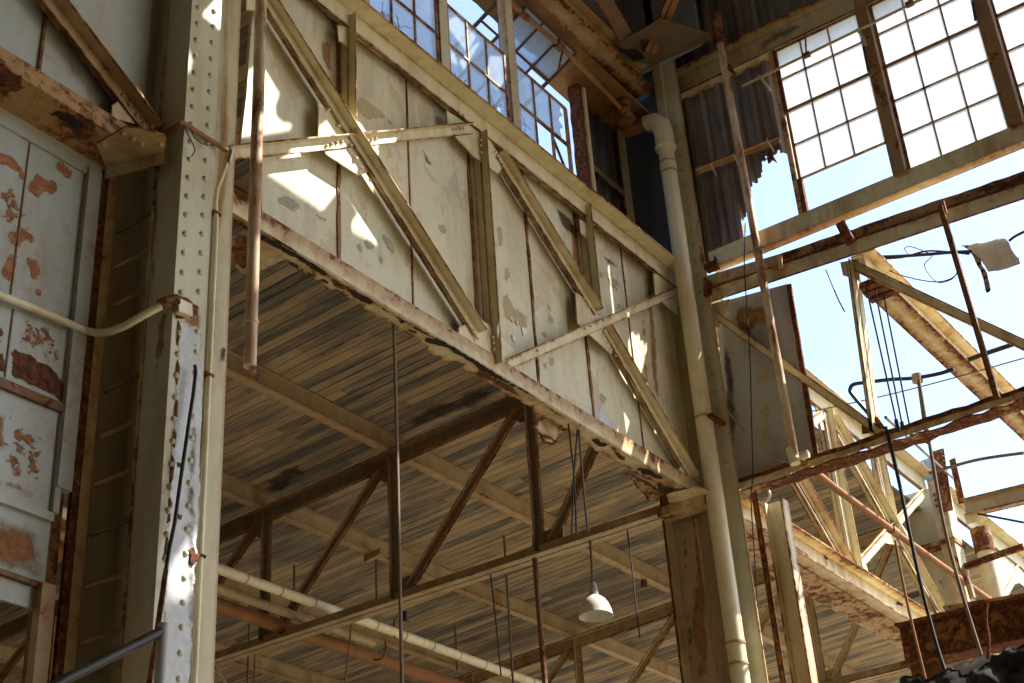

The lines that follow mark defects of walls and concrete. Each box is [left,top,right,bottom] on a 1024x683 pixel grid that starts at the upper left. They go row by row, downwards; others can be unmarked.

corrosion [0,63,23,96]
corrosion [56,112,94,138]
peeling [497,295,527,342]
corrosion [0,415,41,489]
peeling [165,320,202,683]
corrosion [0,523,36,569]